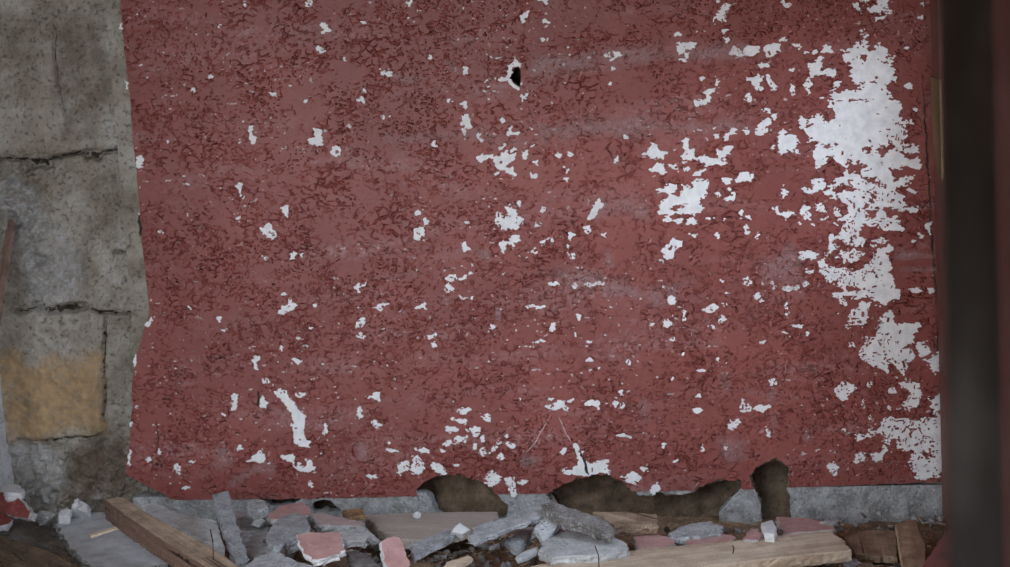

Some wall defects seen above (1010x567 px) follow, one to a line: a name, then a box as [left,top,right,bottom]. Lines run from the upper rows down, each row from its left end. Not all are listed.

crack [55,34,67,117]
peeling [484,57,529,102]
crack [0,149,118,166]
peeling [308,128,341,157]
peeling [447,98,539,179]
peeling [495,200,546,254]
peeling [567,198,607,269]
peeling [642,0,942,480]
peeling [236,355,322,488]
spalling [386,401,528,516]
peeling [545,398,600,411]
spalling [546,443,791,519]